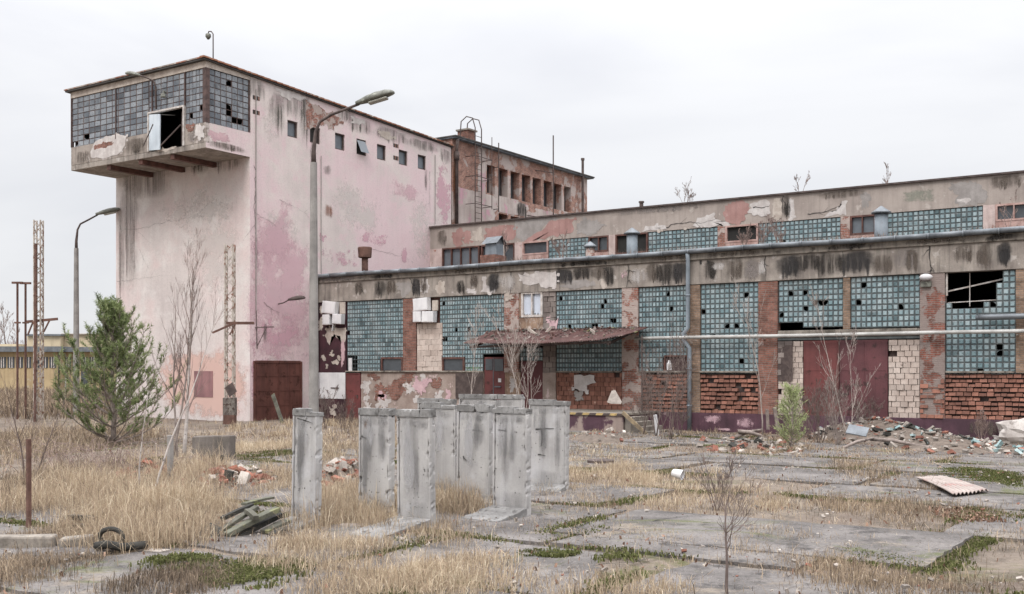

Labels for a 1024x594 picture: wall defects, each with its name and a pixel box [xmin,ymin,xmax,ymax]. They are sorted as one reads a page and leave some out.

peeling [90,133,128,159]
peeling [642,198,796,233]
peeling [825,200,848,217]
water stain [119,185,134,285]
water stain [706,251,765,280]
water stain [778,234,1013,279]
water stain [375,274,395,296]
water stain [412,279,426,295]
peeling [318,306,347,369]
peeling [361,372,451,408]
peeling [571,375,596,401]